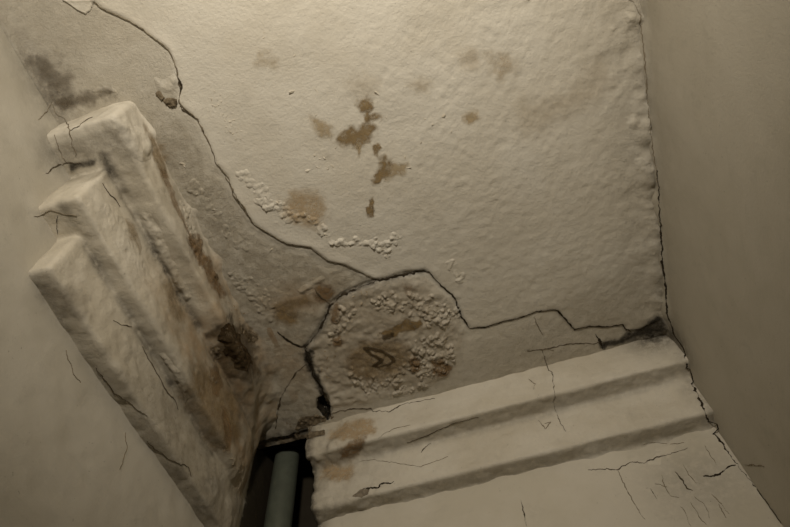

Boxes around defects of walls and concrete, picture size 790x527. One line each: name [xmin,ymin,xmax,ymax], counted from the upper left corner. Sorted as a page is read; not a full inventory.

peeling [154,72,180,108]
damp [314,100,406,184]
crack [95,2,654,430]
crack [631,0,781,523]
damp [351,319,422,378]
damp [431,360,452,377]
crack [147,441,192,477]
crack [335,398,479,467]
crack [589,448,687,519]